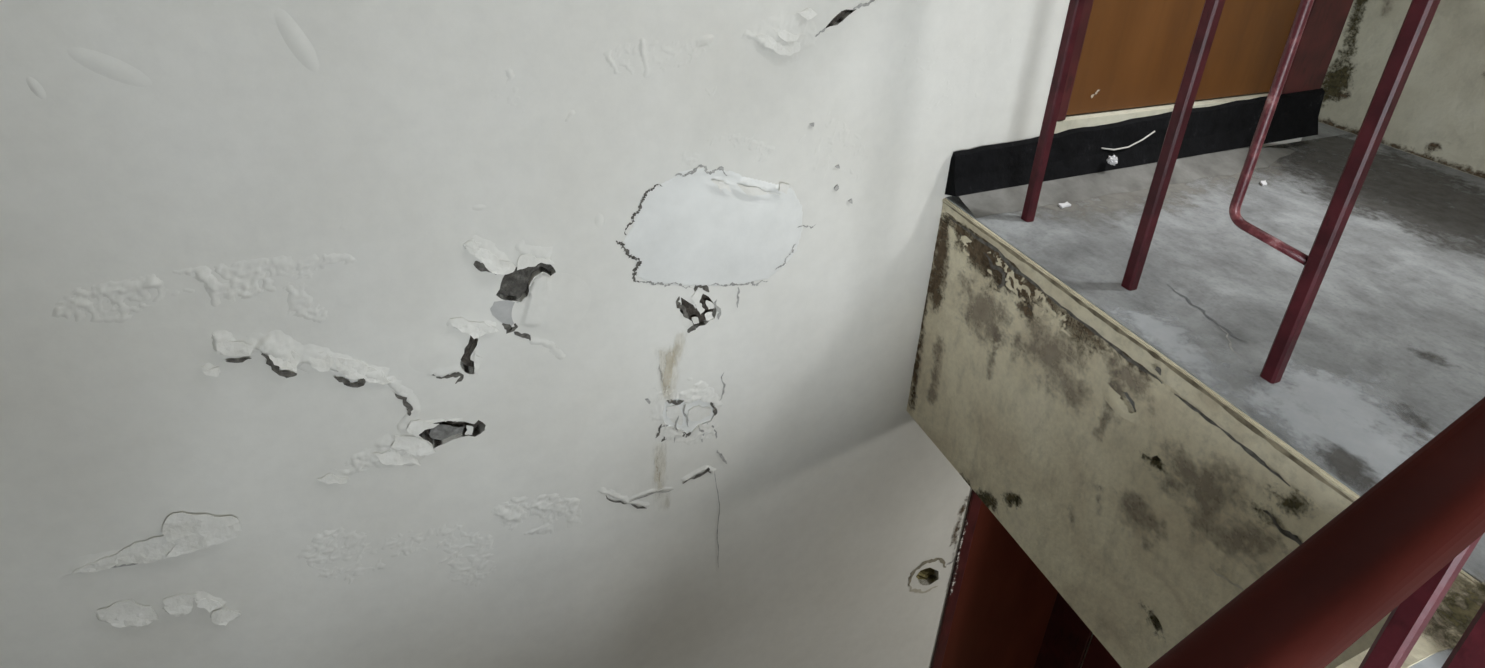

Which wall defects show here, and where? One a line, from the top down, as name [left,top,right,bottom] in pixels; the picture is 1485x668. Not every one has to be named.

crack [815,0,881,37]
spalling [201,235,591,485]
spalling [645,365,726,445]
spalling [676,285,721,333]
leakage [909,201,1149,427]
leakage [1107,309,1216,386]
leakage [1244,369,1435,490]
spalling [908,499,968,595]
leakage [1166,451,1272,556]
peeling [94,591,241,628]